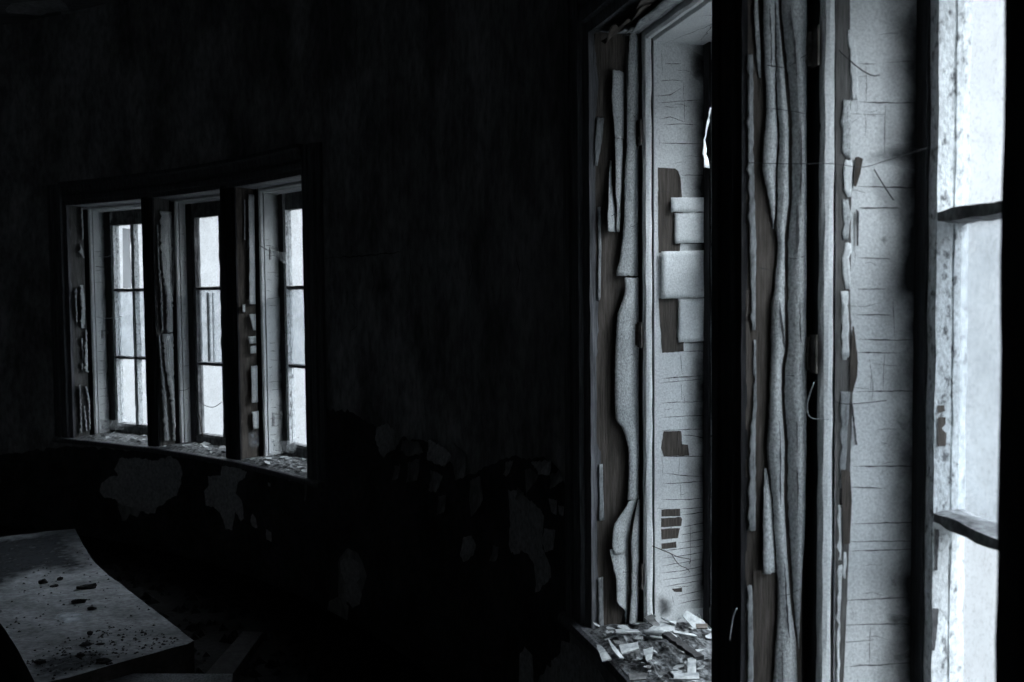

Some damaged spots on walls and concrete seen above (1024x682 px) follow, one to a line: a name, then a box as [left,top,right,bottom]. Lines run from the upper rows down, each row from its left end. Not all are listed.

crack [626,15,712,176]
crack [848,61,906,152]
crack [857,186,899,209]
peeling [593,0,712,682]
peeling [746,0,807,682]
peeling [835,0,863,682]
crack [848,288,909,395]
crack [657,315,701,604]
crack [855,429,898,488]
crack [843,522,904,565]
crack [848,592,895,681]